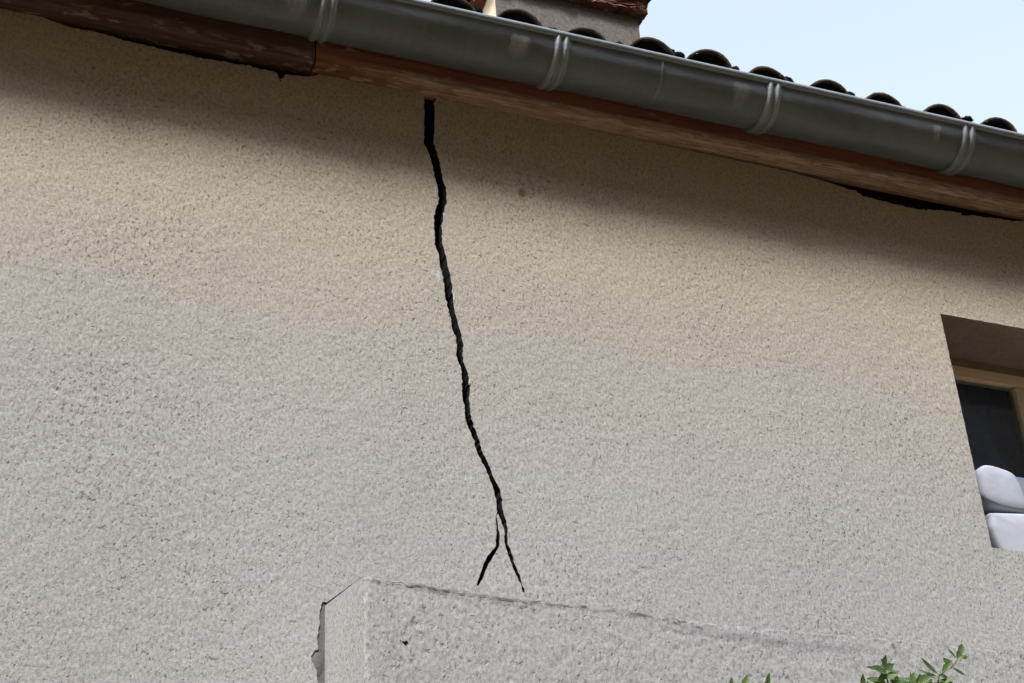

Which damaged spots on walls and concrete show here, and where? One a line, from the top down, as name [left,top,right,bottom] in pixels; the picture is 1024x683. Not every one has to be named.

crack [374,98,723,632]